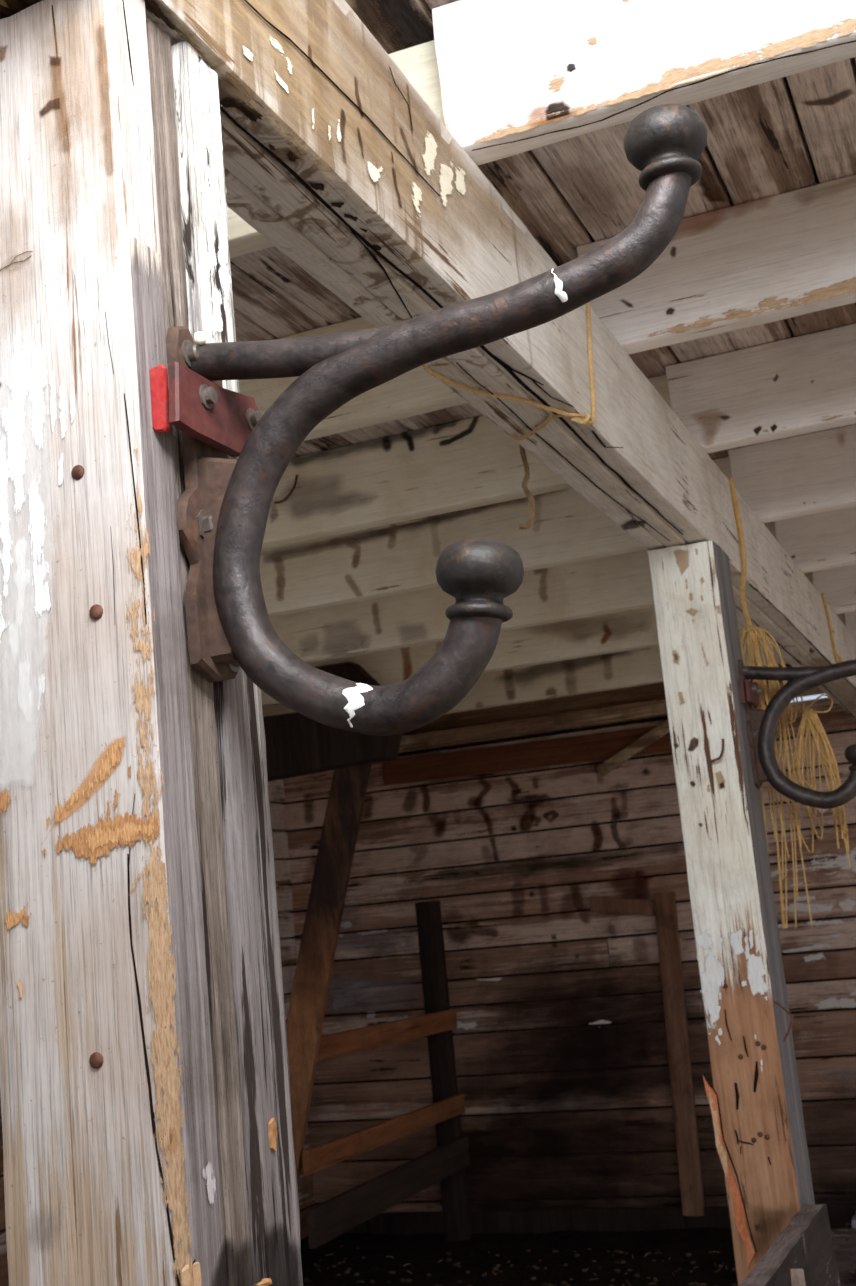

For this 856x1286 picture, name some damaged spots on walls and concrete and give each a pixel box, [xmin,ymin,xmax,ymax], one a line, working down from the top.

peeling [269,35,293,93]
peeling [312,108,341,142]
peeling [367,161,383,182]
peeling [411,131,467,219]
peeling [472,17,856,151]
peeling [648,277,856,337]
peeling [0,336,75,783]
spalling [41,738,159,865]
peeling [771,848,856,962]
peeling [696,929,770,1045]
peeling [814,991,856,1013]
crack [127,846,196,1286]